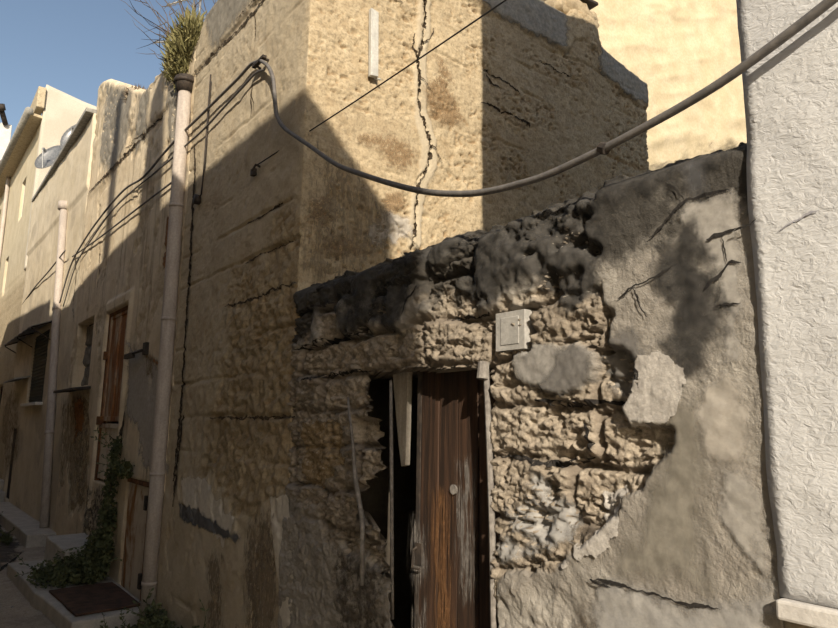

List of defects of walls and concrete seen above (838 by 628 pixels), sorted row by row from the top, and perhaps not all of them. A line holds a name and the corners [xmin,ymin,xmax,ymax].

crack [410,0,441,250]
damp [301,141,739,339]
crack [649,182,729,238]
crack [618,265,673,317]
damp [655,222,729,376]
damp [603,329,644,395]
peeling [622,350,686,430]
peeling [561,485,629,569]
crack [590,578,720,610]